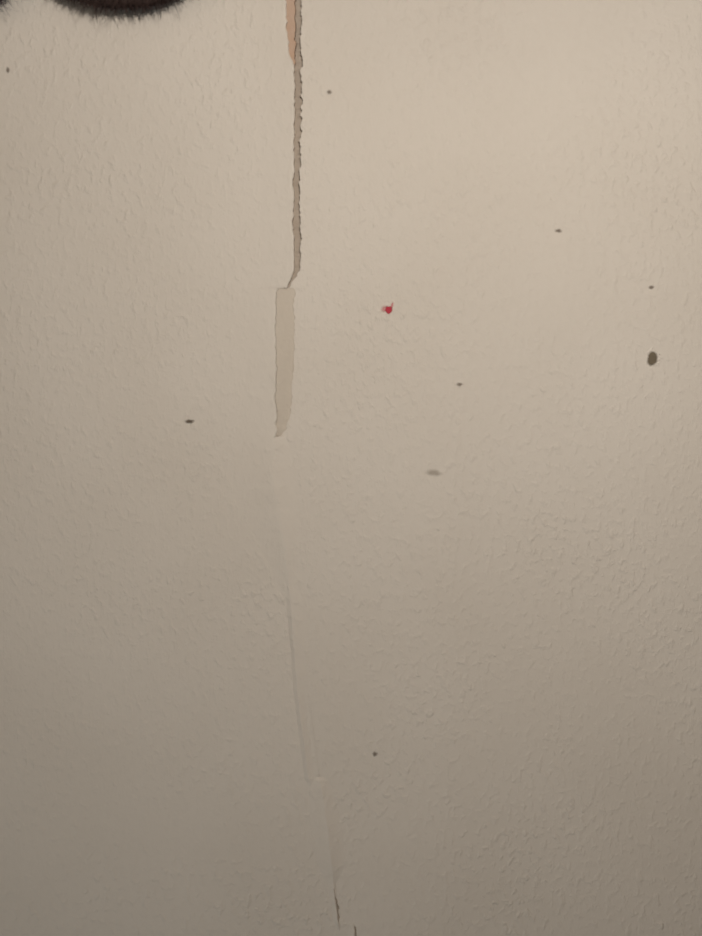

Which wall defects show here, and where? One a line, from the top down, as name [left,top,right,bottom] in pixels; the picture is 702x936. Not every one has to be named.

peeling [275,288,296,437]
crack [235,0,357,936]